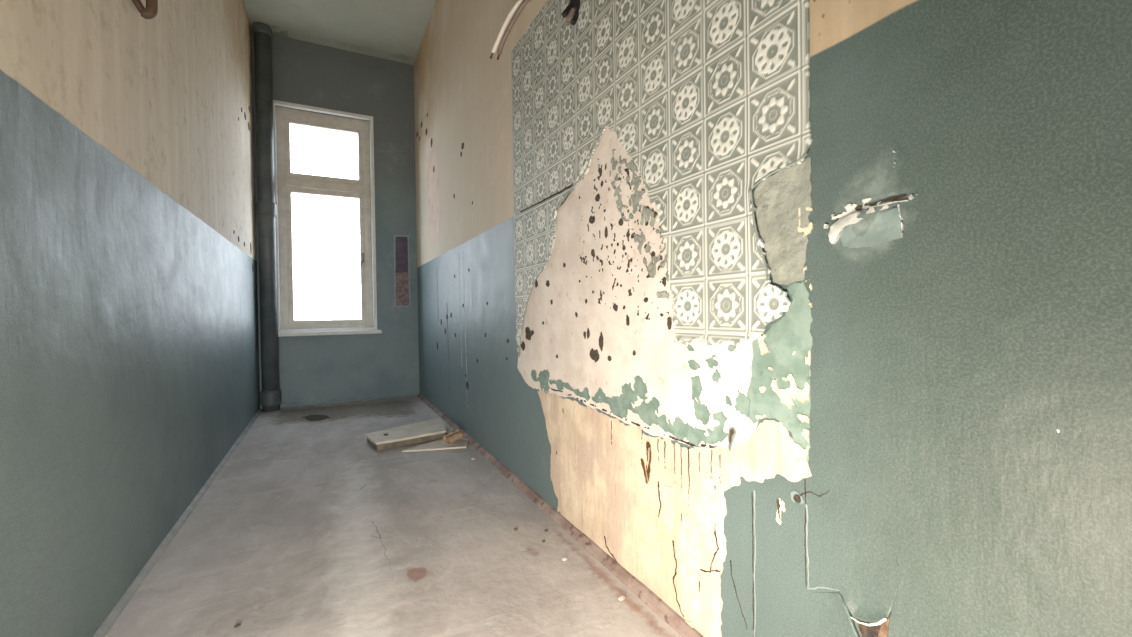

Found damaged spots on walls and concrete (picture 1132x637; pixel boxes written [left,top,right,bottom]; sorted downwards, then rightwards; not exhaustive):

flaking render [798,139,923,273]
peeling [506,126,813,637]
flaking render [809,530,901,637]